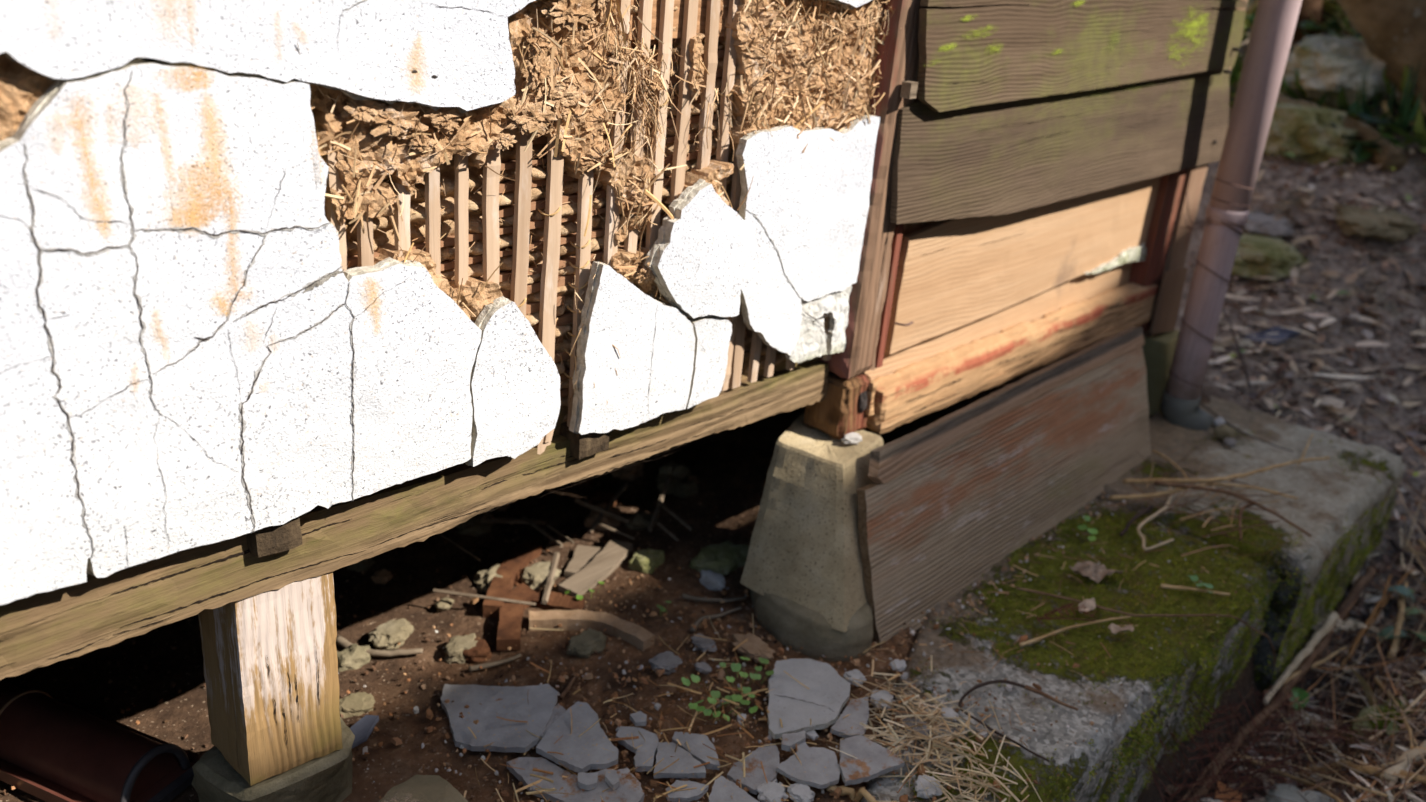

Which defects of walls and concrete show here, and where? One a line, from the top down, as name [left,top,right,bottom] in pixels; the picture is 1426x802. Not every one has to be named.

crack [0,58,408,567]
spalling [309,0,896,401]
crack [744,209,833,332]